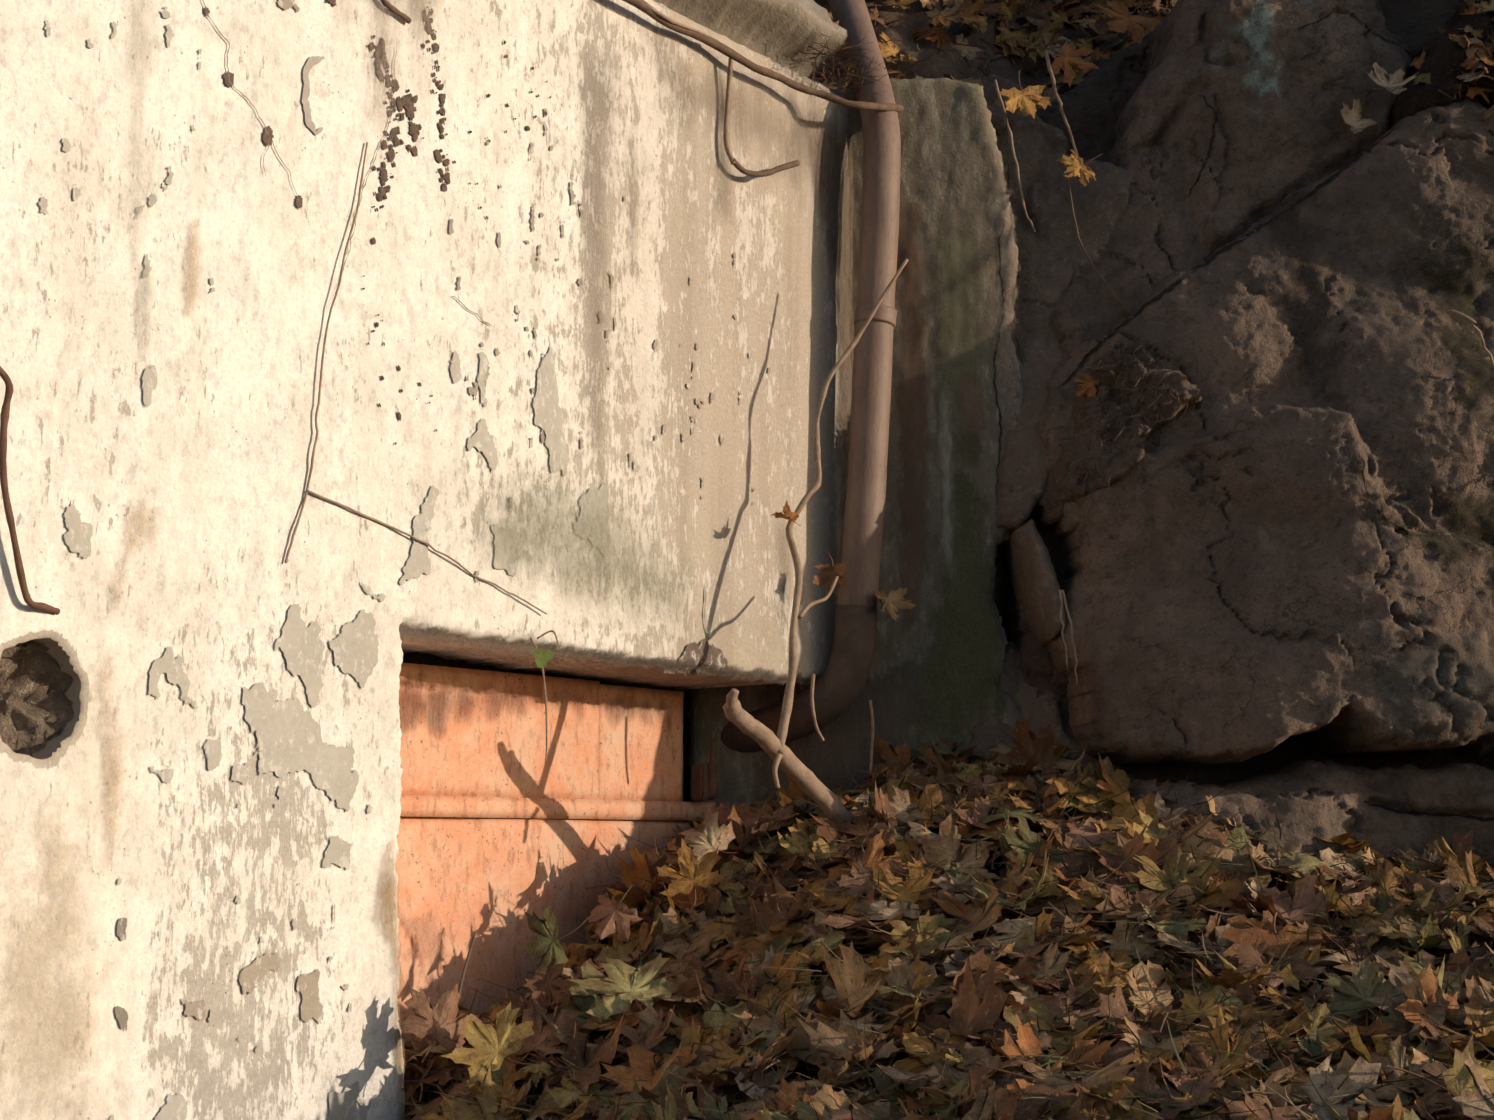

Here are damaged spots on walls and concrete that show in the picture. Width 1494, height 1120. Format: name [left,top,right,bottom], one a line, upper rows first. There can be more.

peeling [525,203,559,261]
water stain [804,121,854,515]
peeling [450,342,500,473]
peeling [515,305,584,476]
peeling [399,485,439,588]
peeling [148,646,198,709]
peeling [202,582,385,814]
corrosion [402,691,473,723]
peeling [150,766,174,783]
peeling [322,835,353,870]
peeling [238,936,280,995]
peeling [296,956,333,1024]